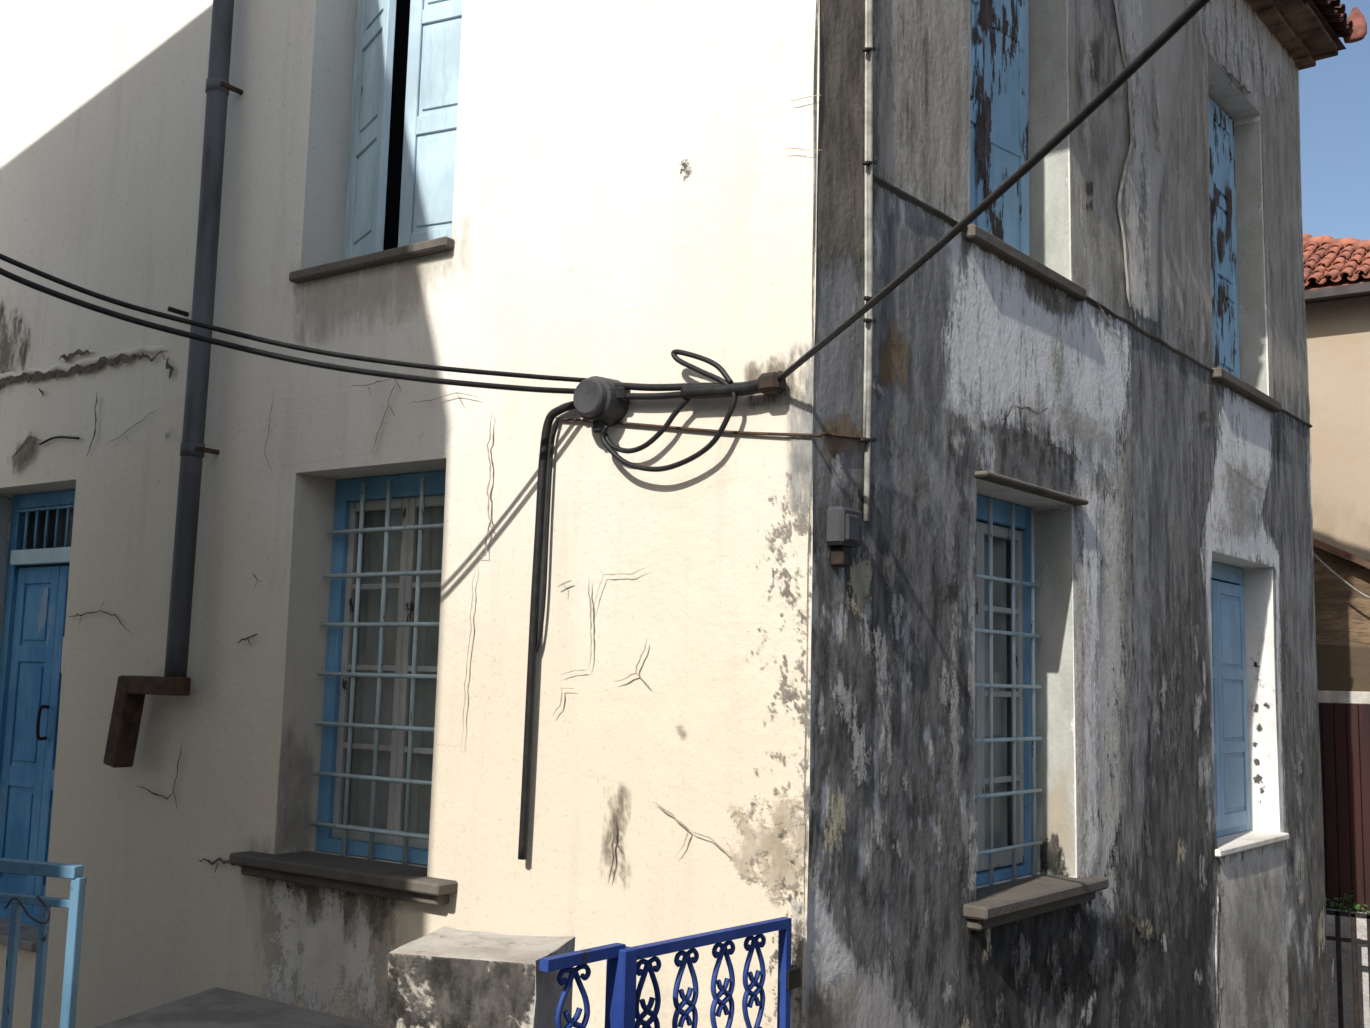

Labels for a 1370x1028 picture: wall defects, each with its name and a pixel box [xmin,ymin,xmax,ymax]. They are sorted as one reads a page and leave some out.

peeling [973,0,993,45]
peeling [975,90,996,209]
peeling [1210,148,1233,267]
damp [0,305,29,384]
peeling [1212,282,1224,317]
crack [64,602,132,636]
crack [352,379,494,744]
crack [553,566,649,715]
damp [750,0,1234,1028]
damp [1253,200,1334,1028]
damp [265,878,394,939]
damp [385,953,534,1028]